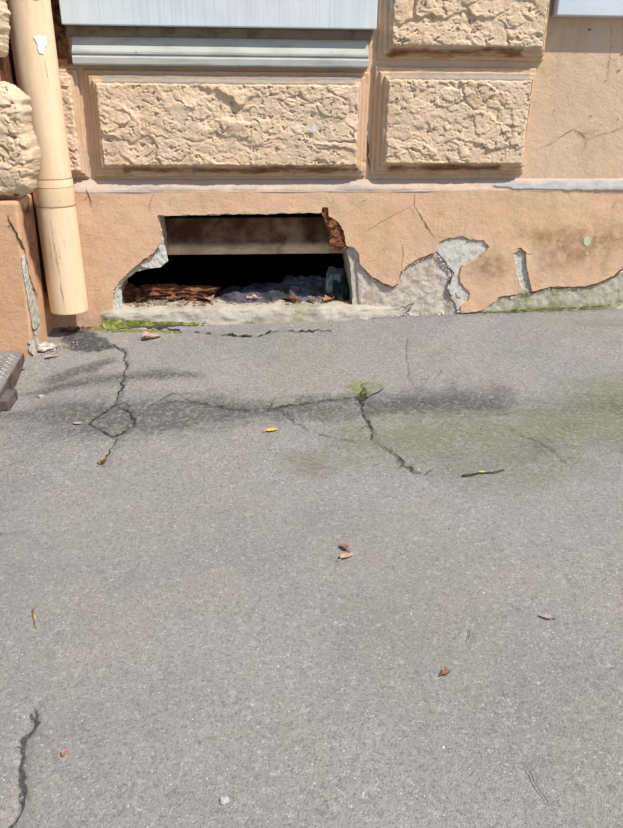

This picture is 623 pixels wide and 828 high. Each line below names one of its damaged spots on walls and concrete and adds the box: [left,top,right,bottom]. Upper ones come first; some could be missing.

crack [7,217,26,253]
spalling [21,255,42,356]
spalling [113,274,127,309]
spalling [136,241,168,269]
crack [150,326,332,336]
crack [363,200,436,239]
spalling [321,207,489,317]
spalling [479,248,623,313]
crack [89,344,433,476]
crack [9,707,41,828]